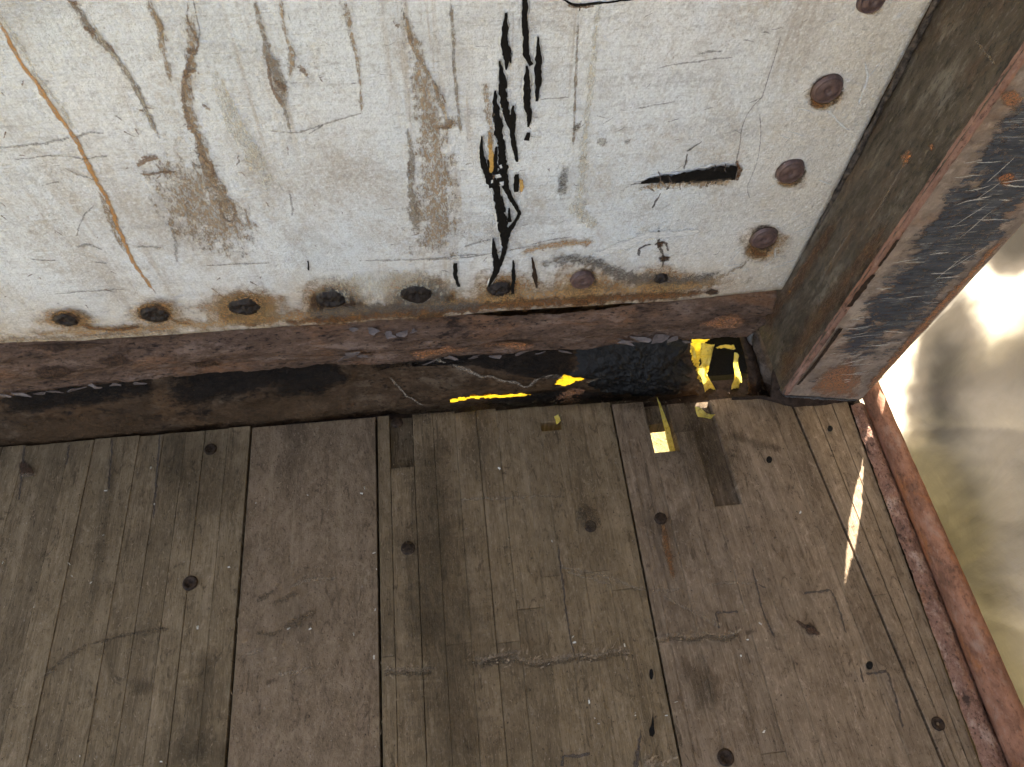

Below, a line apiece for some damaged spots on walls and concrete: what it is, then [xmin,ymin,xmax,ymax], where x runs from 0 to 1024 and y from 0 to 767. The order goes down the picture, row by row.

damp [136,155,258,257]
corrosion [0,0,727,366]
damp [393,6,465,256]
crack [478,0,544,294]
corrosion [809,75,842,109]
corrosion [0,366,147,398]
damp [272,363,350,397]
corrosion [812,240,1002,398]